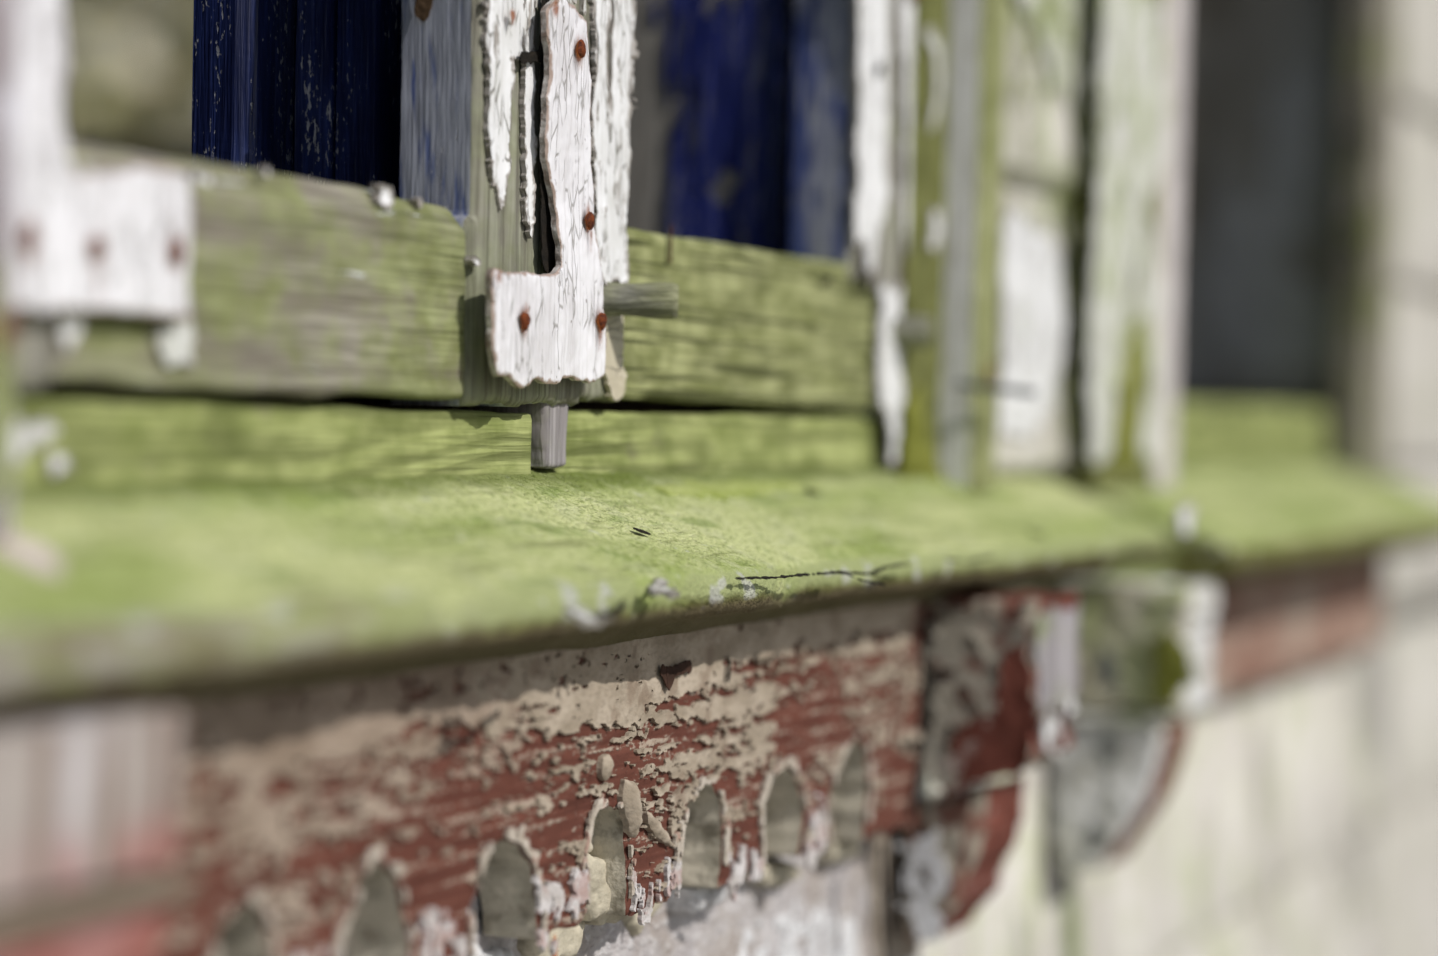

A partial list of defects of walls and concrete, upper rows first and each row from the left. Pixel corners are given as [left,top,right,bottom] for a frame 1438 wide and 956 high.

peeling [567,0,790,285]
peeling [851,0,942,466]
peeling [996,206,1066,442]
peeling [1019,0,1170,474]
crack [735,563,911,586]
peeling [142,599,1119,956]